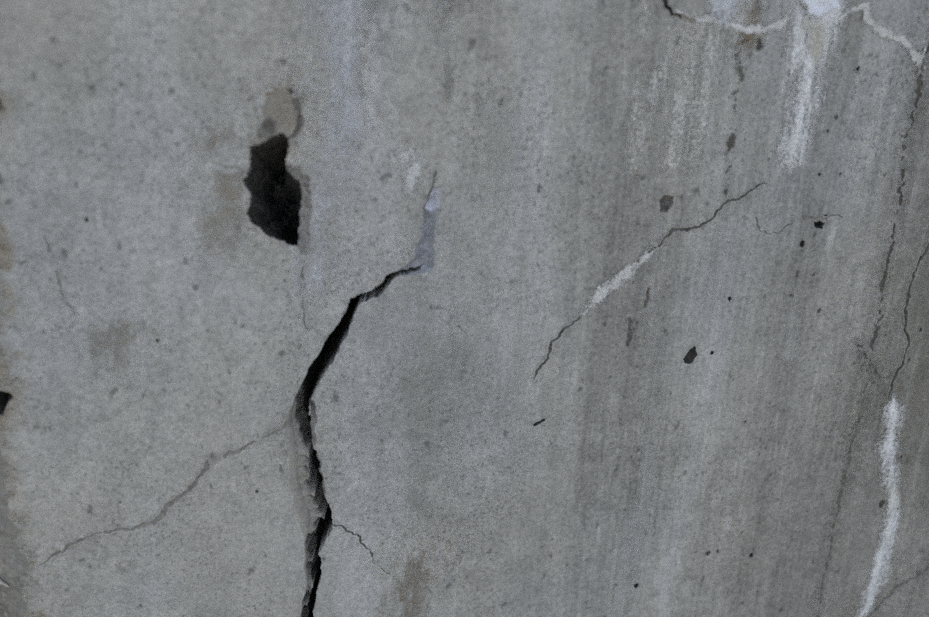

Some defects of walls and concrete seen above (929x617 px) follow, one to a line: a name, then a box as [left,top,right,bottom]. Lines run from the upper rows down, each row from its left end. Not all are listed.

crack [661,0,696,26]
water stain [627,0,927,172]
crack [36,163,443,617]
hole [207,77,315,331]
crack [530,180,846,382]
crack [851,41,929,402]
efflorescence [857,396,903,617]
crack [863,565,929,617]